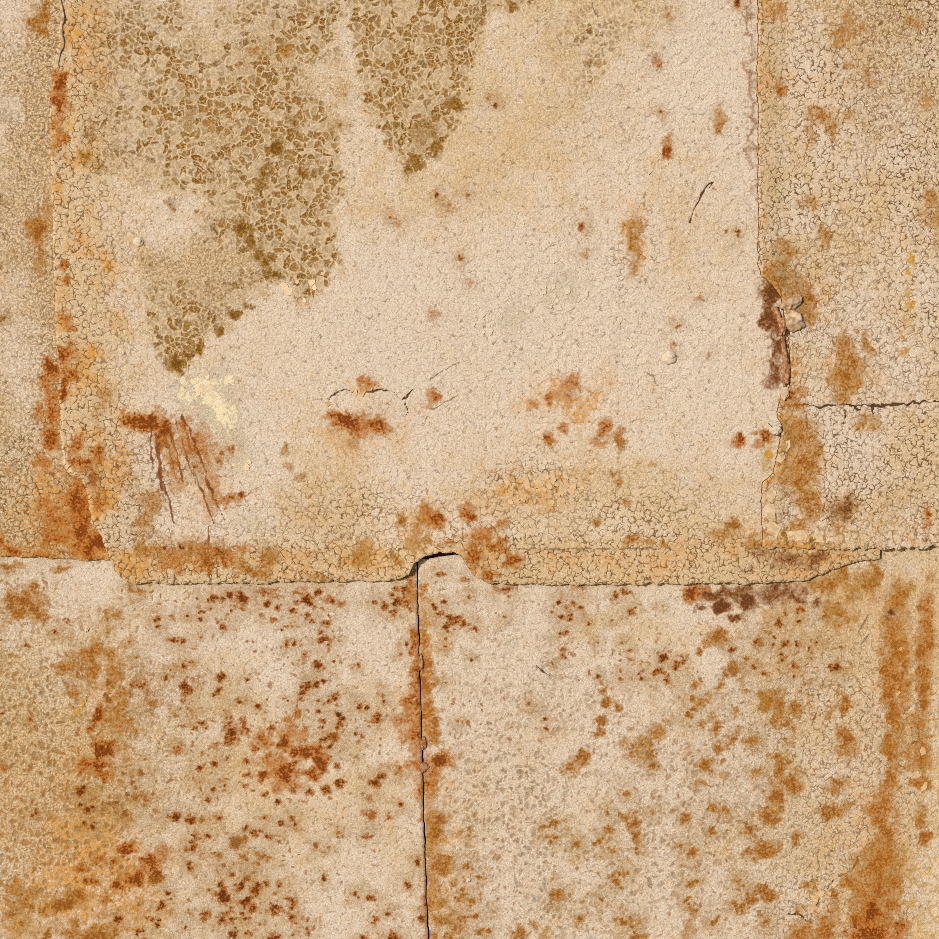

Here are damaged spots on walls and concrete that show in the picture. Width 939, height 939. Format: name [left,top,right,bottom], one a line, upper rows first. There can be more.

corrosion [0,314,110,573]
peeling [279,272,325,303]
corrosion [323,411,392,446]
crack [330,363,459,415]
corrosion [758,235,858,529]
crack [797,400,939,424]
corrosion [55,607,211,871]
corrosion [118,407,346,805]
corrosion [199,816,315,939]
corrosion [559,674,623,778]
corrosion [681,534,883,864]
corrosion [784,575,938,939]